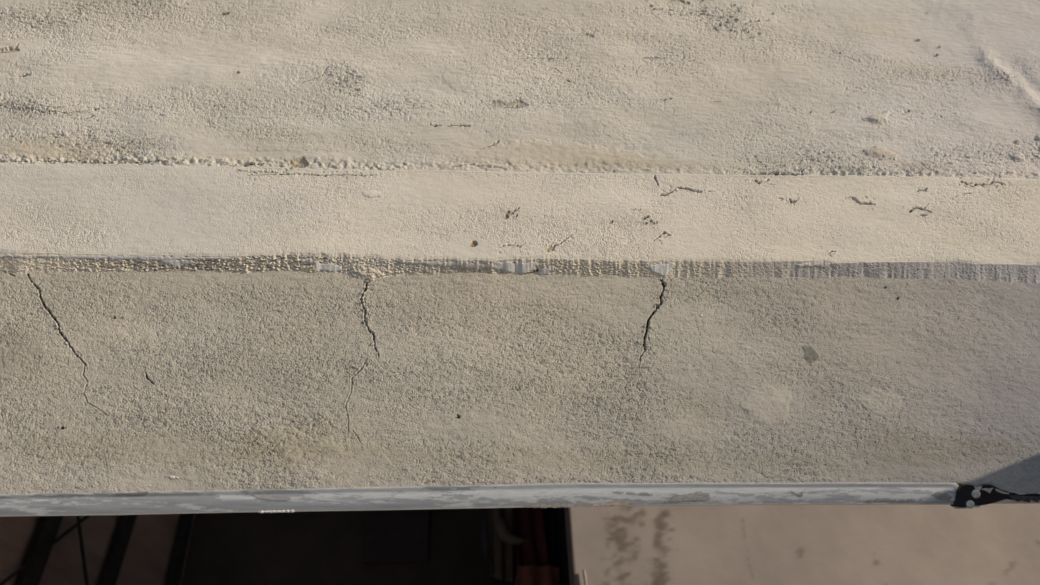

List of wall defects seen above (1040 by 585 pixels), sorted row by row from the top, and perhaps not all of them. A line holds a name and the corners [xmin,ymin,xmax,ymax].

crack [1,271,101,411]
crack [345,282,379,440]
crack [627,279,666,369]